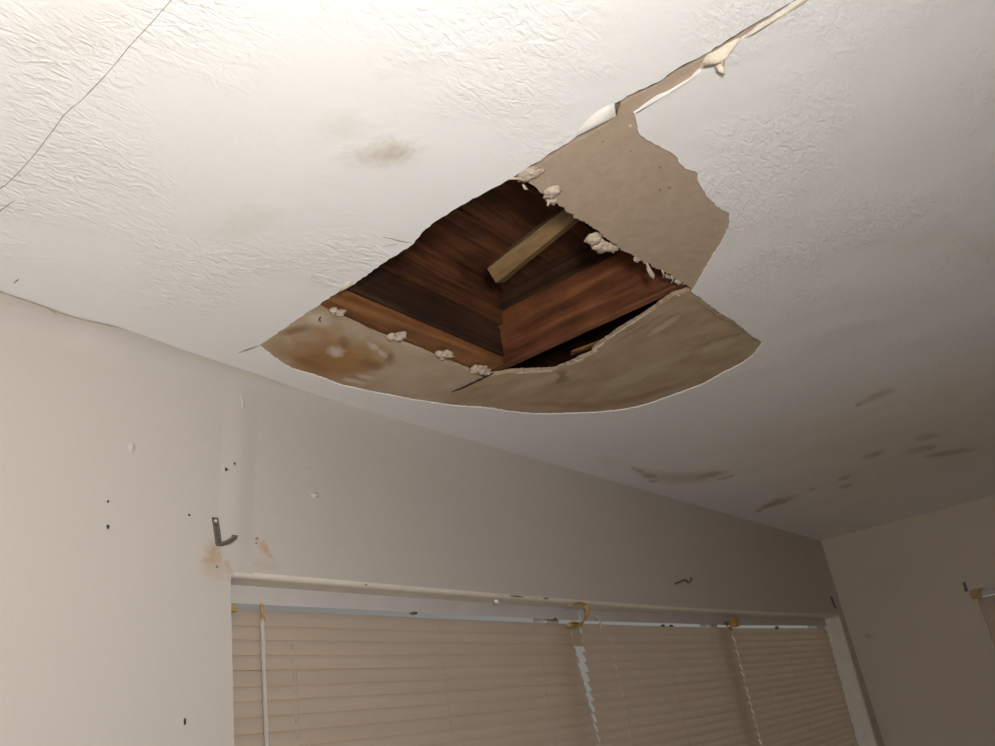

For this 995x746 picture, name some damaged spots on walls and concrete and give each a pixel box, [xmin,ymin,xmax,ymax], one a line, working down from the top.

crack [0,0,171,211]
leakage [301,98,442,175]
peeling [575,104,615,137]
peeling [634,0,808,115]
leakage [260,307,411,392]
leakage [623,319,995,527]